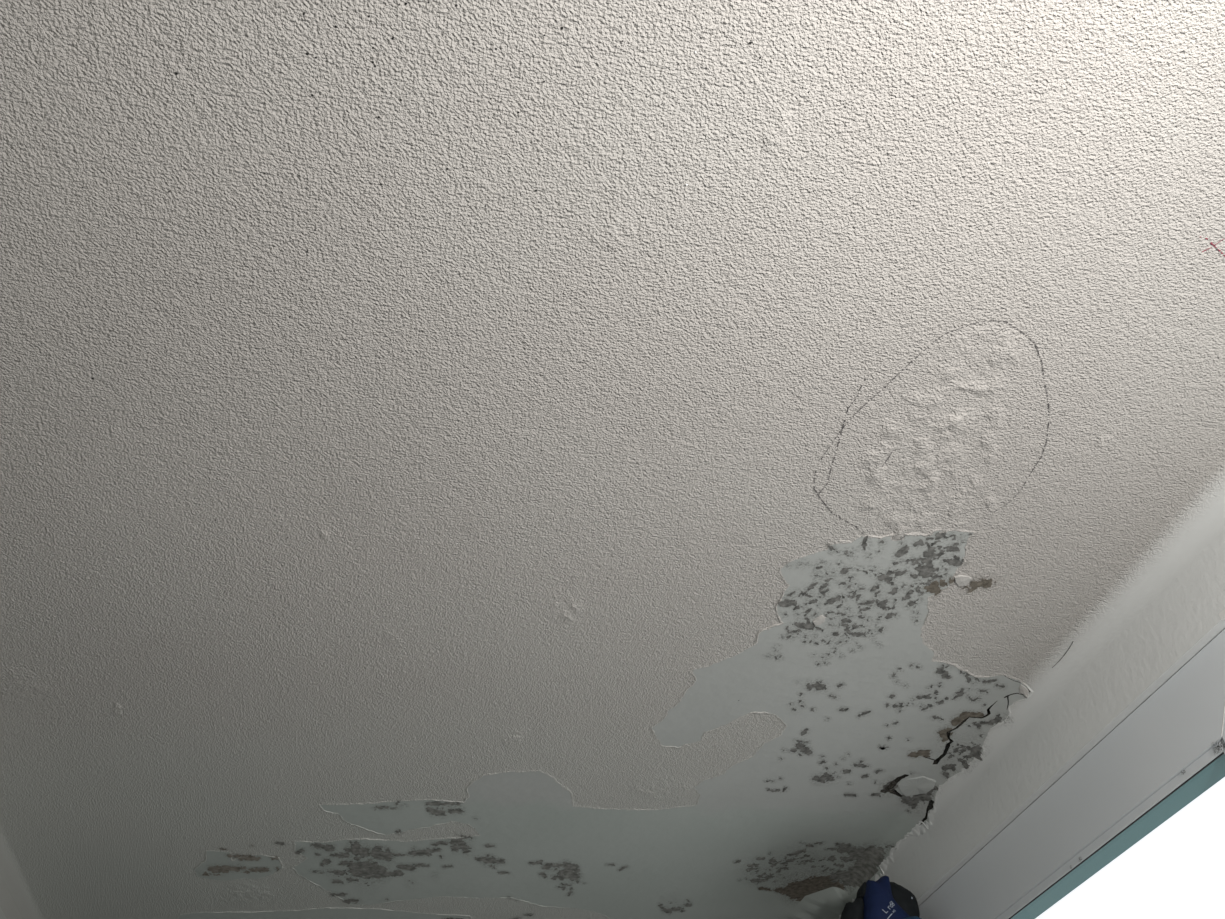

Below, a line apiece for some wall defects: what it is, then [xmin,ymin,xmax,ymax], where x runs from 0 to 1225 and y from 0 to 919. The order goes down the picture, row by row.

peeling [202,527,1033,919]
crack [874,676,1032,826]